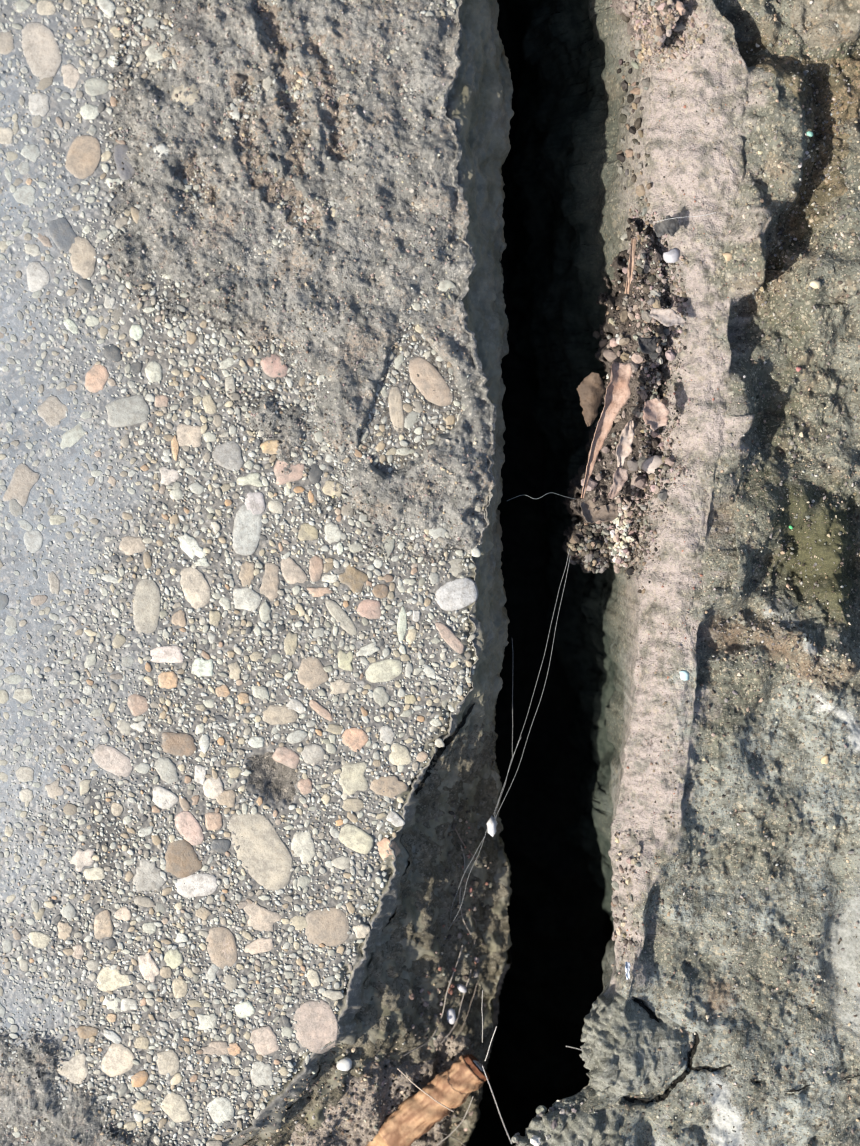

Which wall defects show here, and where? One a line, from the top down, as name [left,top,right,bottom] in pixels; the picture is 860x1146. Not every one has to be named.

spalling [101,0,497,567]
crack [416,0,606,1146]
spalling [0,1020,174,1146]
crack [634,999,660,1023]
crack [623,1034,811,1104]